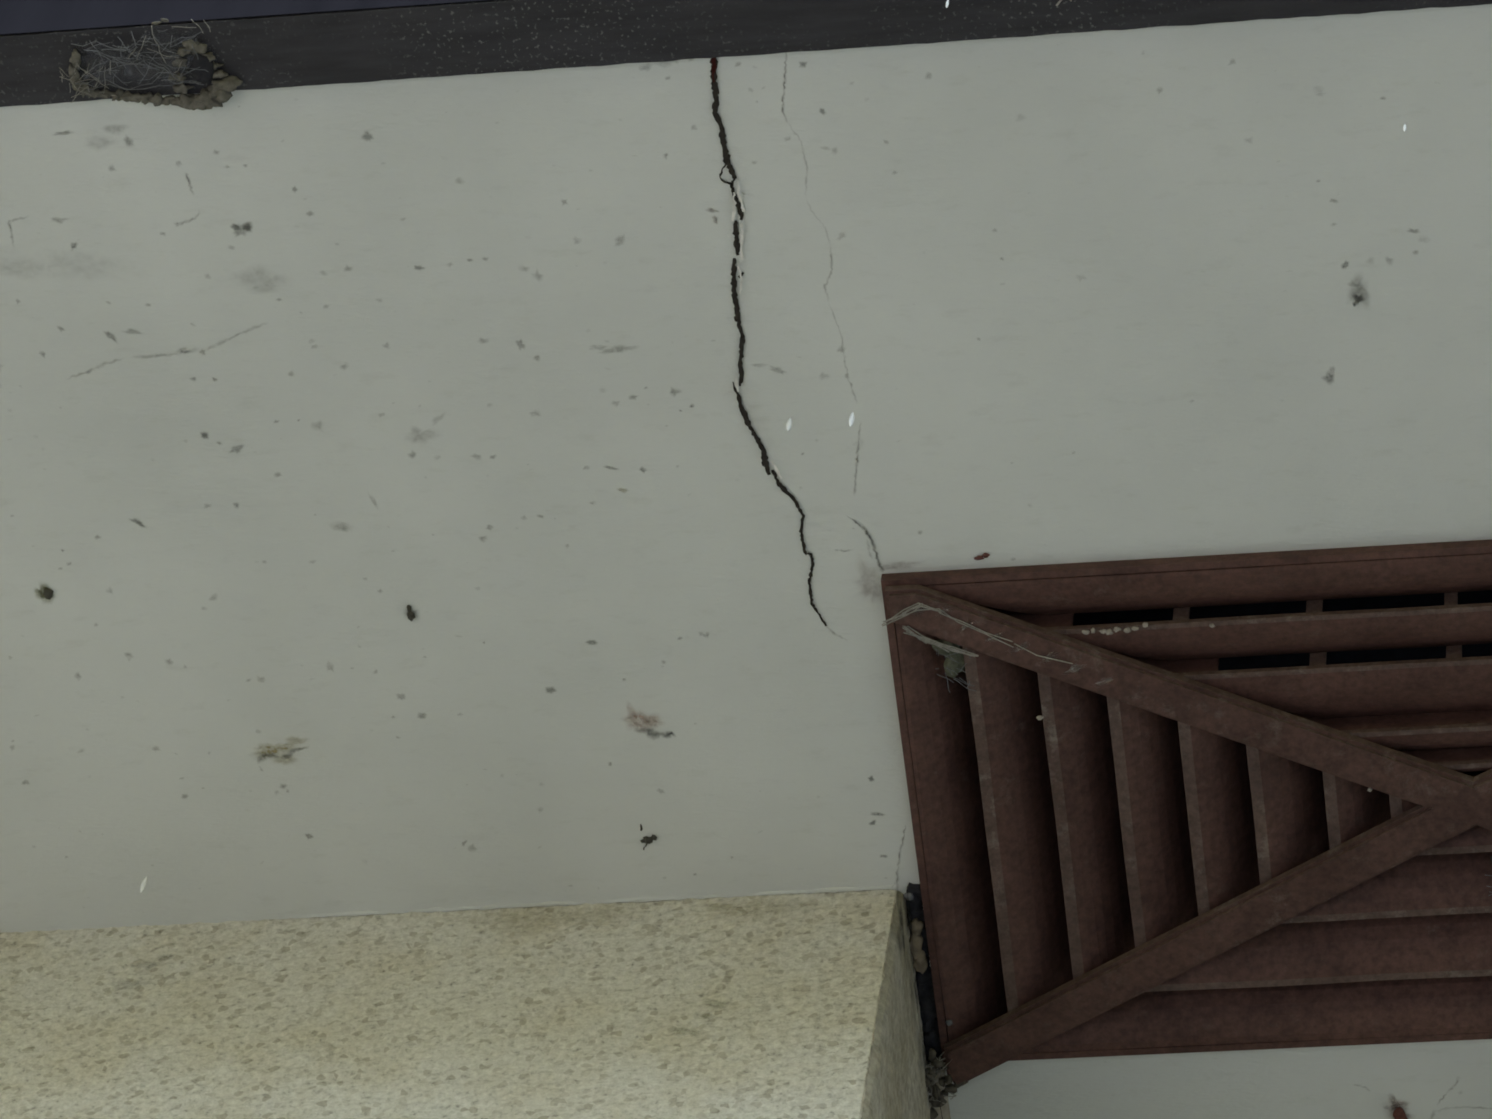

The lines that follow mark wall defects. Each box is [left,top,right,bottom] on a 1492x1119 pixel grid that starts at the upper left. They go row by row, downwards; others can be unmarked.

crack [710,58,827,627]